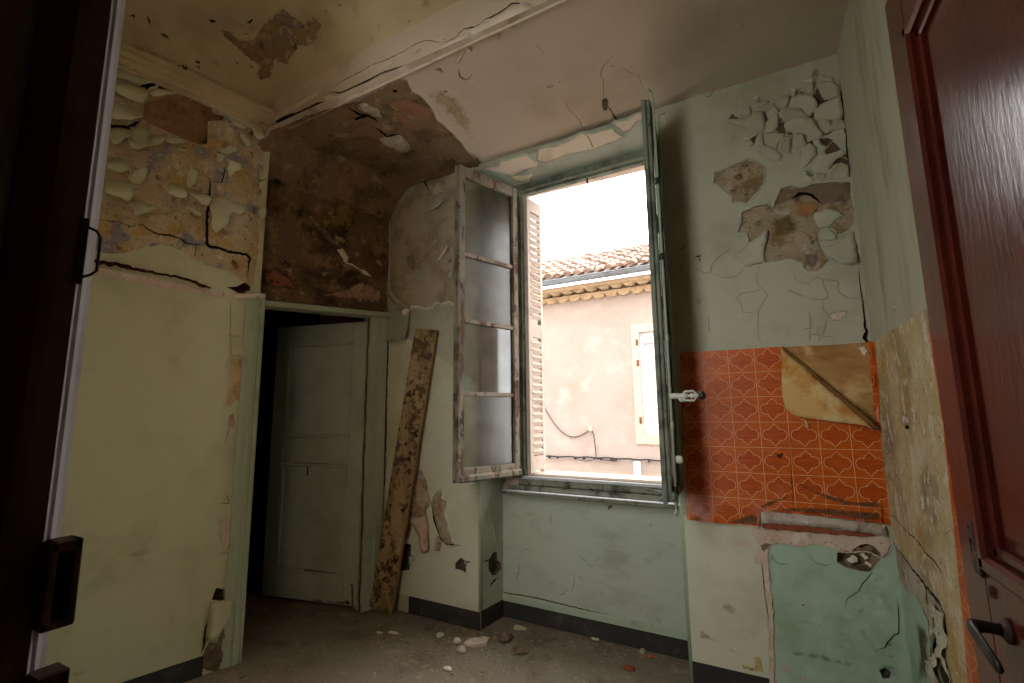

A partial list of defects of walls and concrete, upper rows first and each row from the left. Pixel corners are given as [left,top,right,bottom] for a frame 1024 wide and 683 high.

crack [323,1,532,95]
crack [94,167,251,289]
peeling [95,2,642,409]
peeling [711,68,857,275]
crack [679,246,868,356]
spalling [200,600,232,673]
peeling [404,464,472,575]
spalling [742,527,951,683]
crack [889,514,944,614]